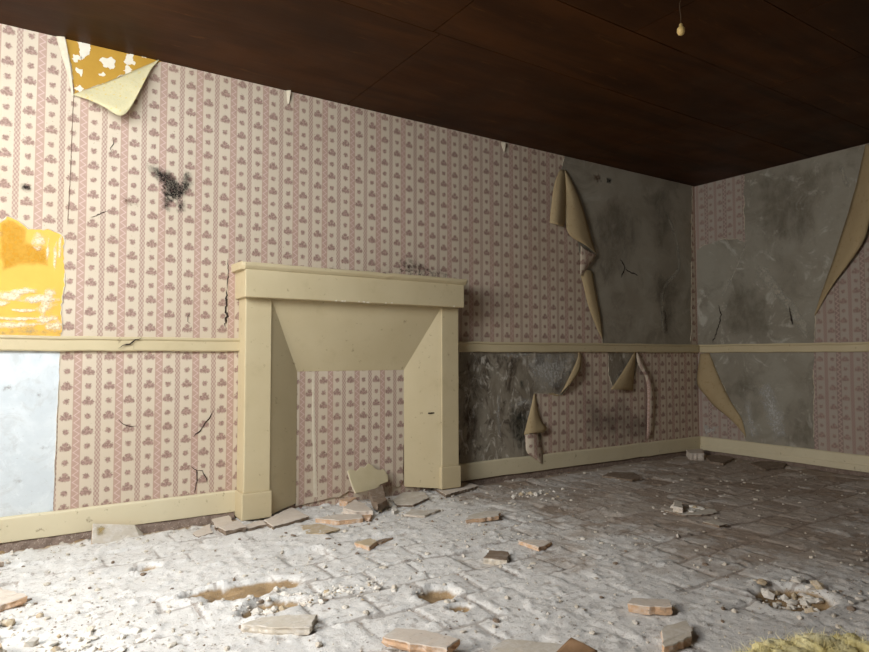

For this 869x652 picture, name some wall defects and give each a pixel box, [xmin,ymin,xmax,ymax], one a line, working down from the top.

peeling [72,42,91,92]
peeling [99,54,146,76]
water stain [154,168,189,209]
peeling [0,216,66,336]
flaking render [561,144,866,449]
flaking render [0,351,60,517]